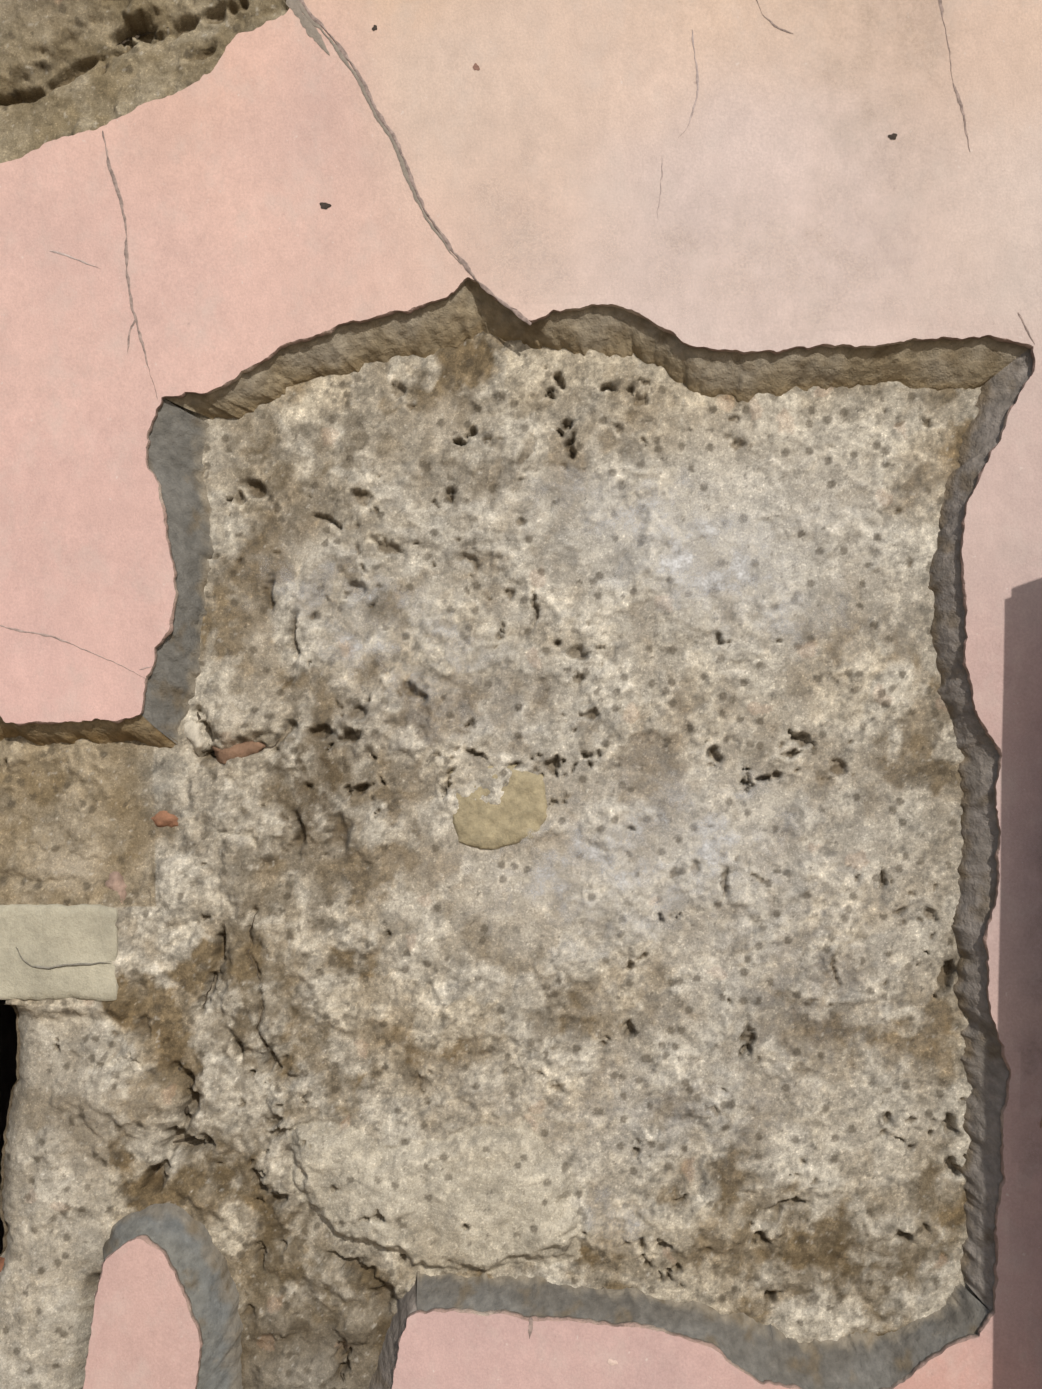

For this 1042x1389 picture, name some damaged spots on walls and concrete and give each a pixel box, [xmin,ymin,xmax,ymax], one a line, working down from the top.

flaking render [0,0,289,163]
crack [286,0,532,325]
crack [756,0,793,34]
crack [938,0,970,150]
crack [50,131,158,399]
crack [0,625,153,678]
flaking render [0,280,1033,1389]